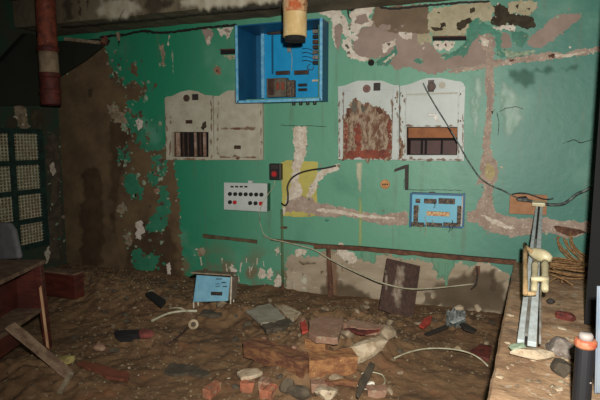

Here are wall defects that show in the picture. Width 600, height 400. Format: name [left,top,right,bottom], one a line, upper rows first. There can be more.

peeling [159,35,174,67]
peeling [44,47,185,275]
spalling [281,125,409,226]
peeling [319,0,600,240]
spalling [221,242,519,317]